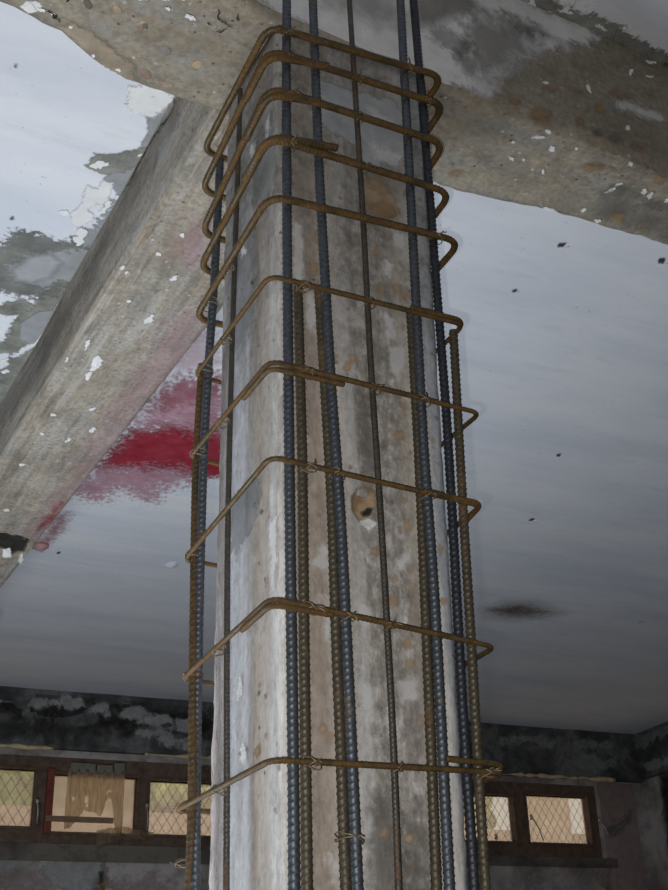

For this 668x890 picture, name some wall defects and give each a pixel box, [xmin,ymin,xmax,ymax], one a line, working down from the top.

spalling [522,0,668,65]
peeling [618,100,663,121]
peeling [58,180,114,246]
spalling [351,489,376,530]
spalling [0,532,33,564]
water stain [0,697,188,734]
water stain [202,715,214,739]